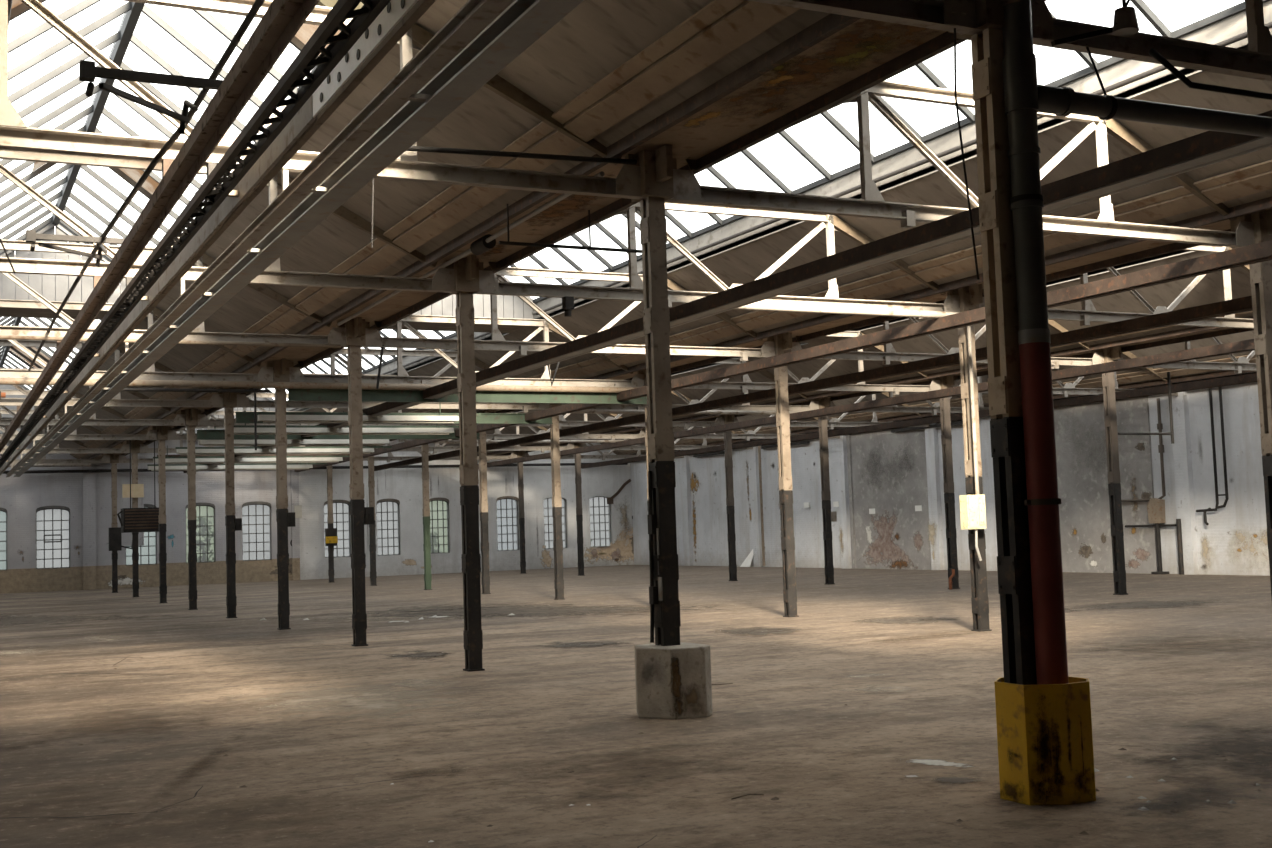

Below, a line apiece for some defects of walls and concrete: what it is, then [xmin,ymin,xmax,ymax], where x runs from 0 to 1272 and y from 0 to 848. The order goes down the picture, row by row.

peeling [583,525,634,565]
peeling [863,510,923,569]